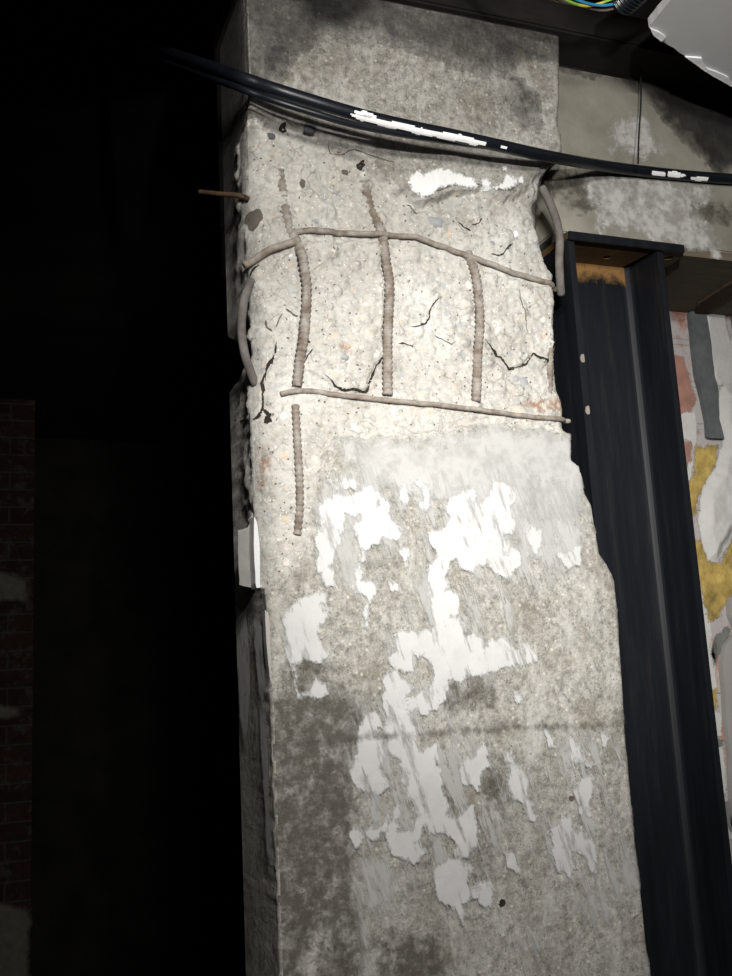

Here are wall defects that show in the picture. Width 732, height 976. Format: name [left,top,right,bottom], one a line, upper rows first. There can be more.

peeling [650,27,666,42]
peeling [685,56,732,87]
damp [544,171,596,209]
crack [234,306,313,423]
crack [324,298,454,393]
crack [486,340,555,369]
flaking render [674,355,697,481]
spalling [224,117,639,976]
peeling [700,584,717,690]
peeling [715,711,726,795]